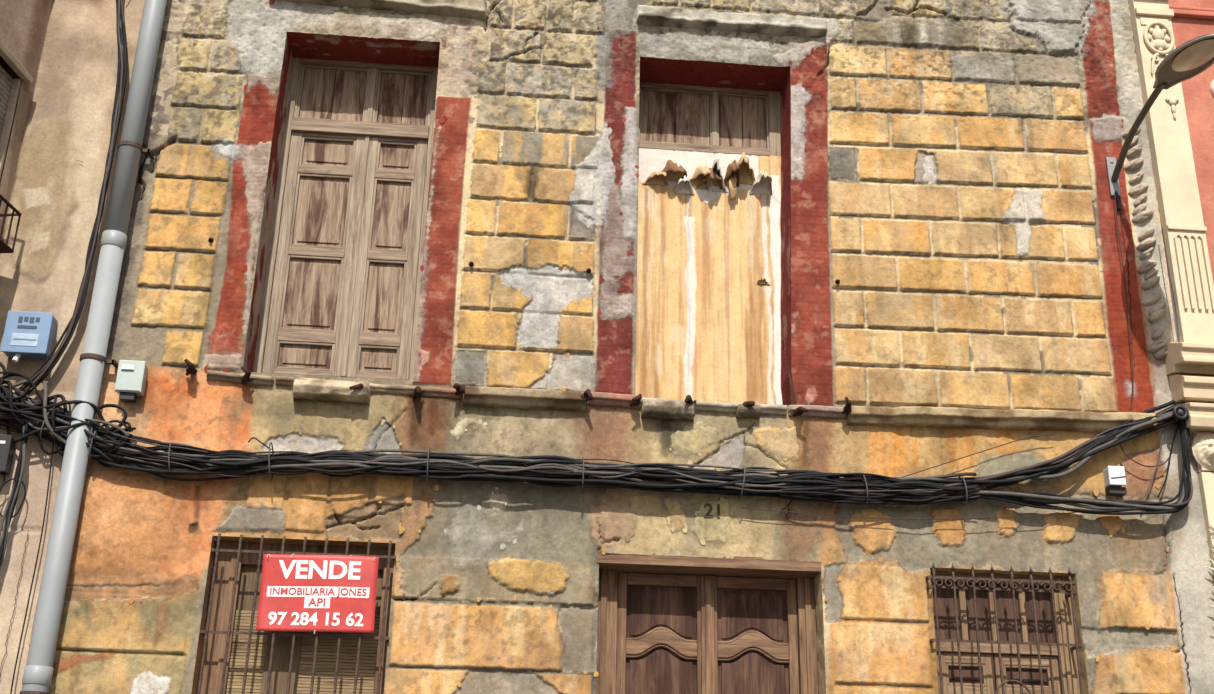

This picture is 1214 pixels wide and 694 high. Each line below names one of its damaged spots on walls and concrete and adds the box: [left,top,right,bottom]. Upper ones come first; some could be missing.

crack [485,0,503,32]
crack [857,0,947,16]
peeling [223,0,444,93]
crack [505,34,543,59]
peeling [497,107,639,392]
flaking render [262,432,344,454]
flaking render [364,418,402,454]
peeling [669,421,799,471]
crack [326,506,403,530]
flaking render [327,479,637,677]
flaking render [834,448,1172,694]
peeling [130,671,172,694]